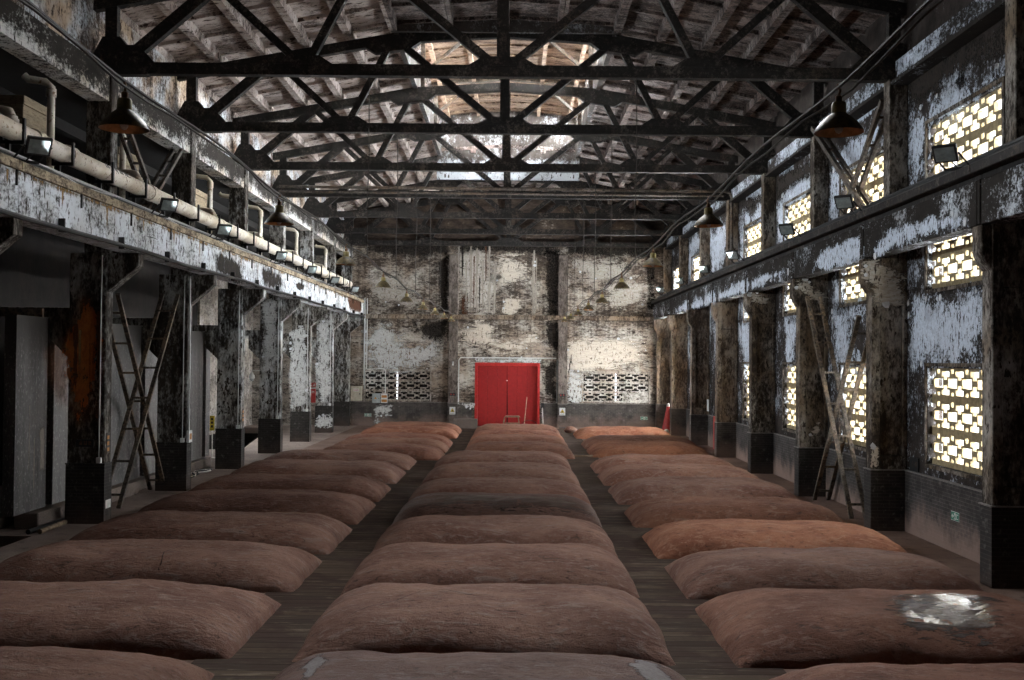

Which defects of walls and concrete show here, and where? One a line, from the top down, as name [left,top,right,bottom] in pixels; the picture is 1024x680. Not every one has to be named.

flaking render [829,126,879,215]
flaking render [908,63,1004,185]
corrosion [61,299,104,424]
flaking render [261,298,333,428]
flaking render [458,320,542,363]
water stain [366,240,656,400]
flaking render [567,336,649,403]
flaking render [675,210,982,374]